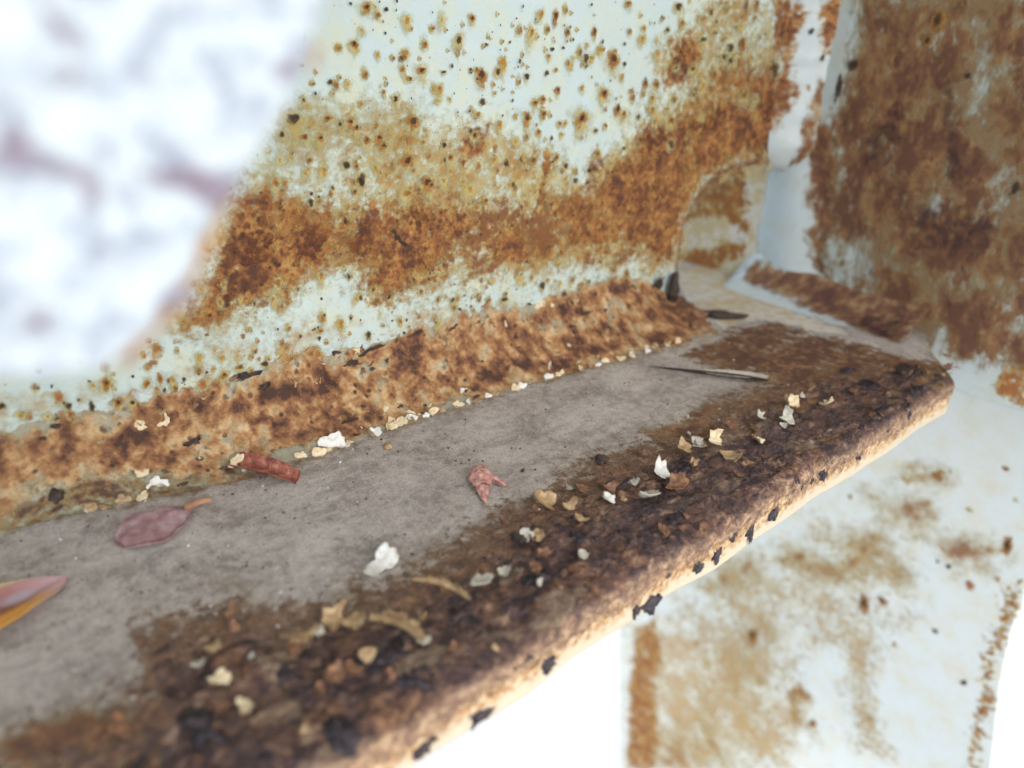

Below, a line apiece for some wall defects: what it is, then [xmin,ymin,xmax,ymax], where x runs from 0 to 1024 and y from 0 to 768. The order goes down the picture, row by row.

rust [0,0,808,531]
rust [0,320,959,768]
peeling [654,454,690,490]
peeling [677,428,724,453]
peeling [779,393,800,425]
rust [743,0,1024,408]